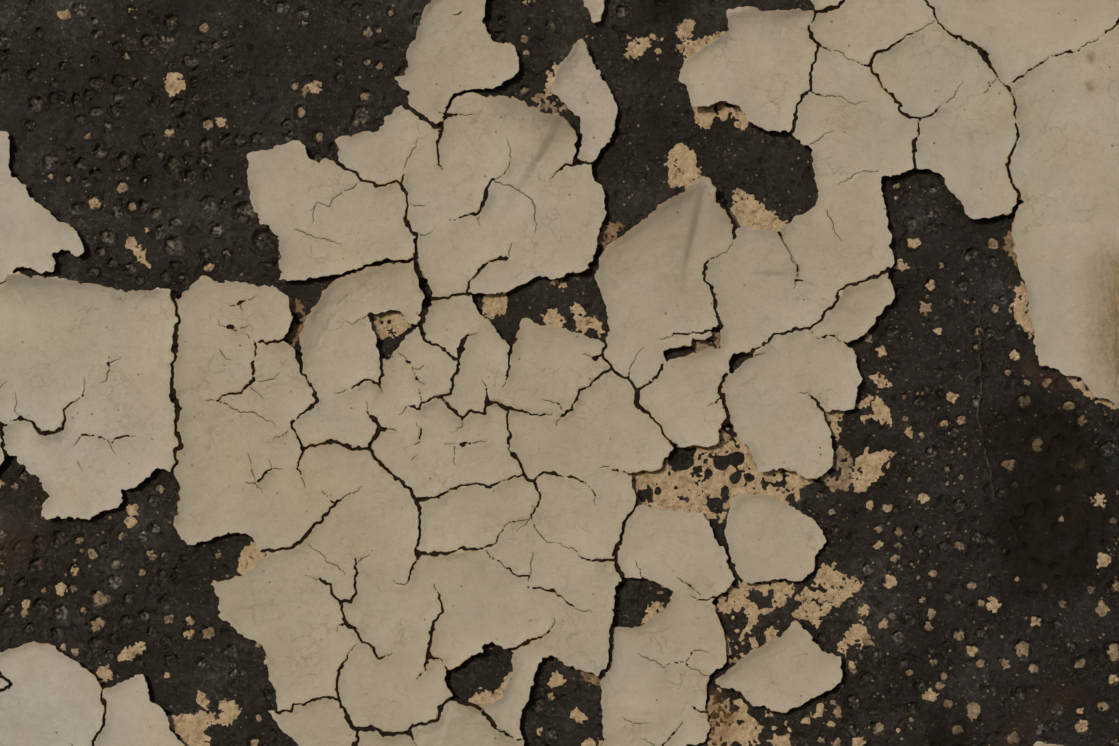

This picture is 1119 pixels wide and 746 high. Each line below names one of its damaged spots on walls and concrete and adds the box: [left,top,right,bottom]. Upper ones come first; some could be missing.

peeling [583,0,631,23]
flaking render [623,34,663,59]
crack [748,267,890,357]
flaking render [869,372,892,388]
crack [0,356,134,468]
crack [800,392,823,411]
crack [169,109,737,746]
spalling [999,578,1119,746]
crack [0,672,13,692]
crack [72,686,107,746]
flaking render [570,707,588,724]
flaking render [767,720,792,746]